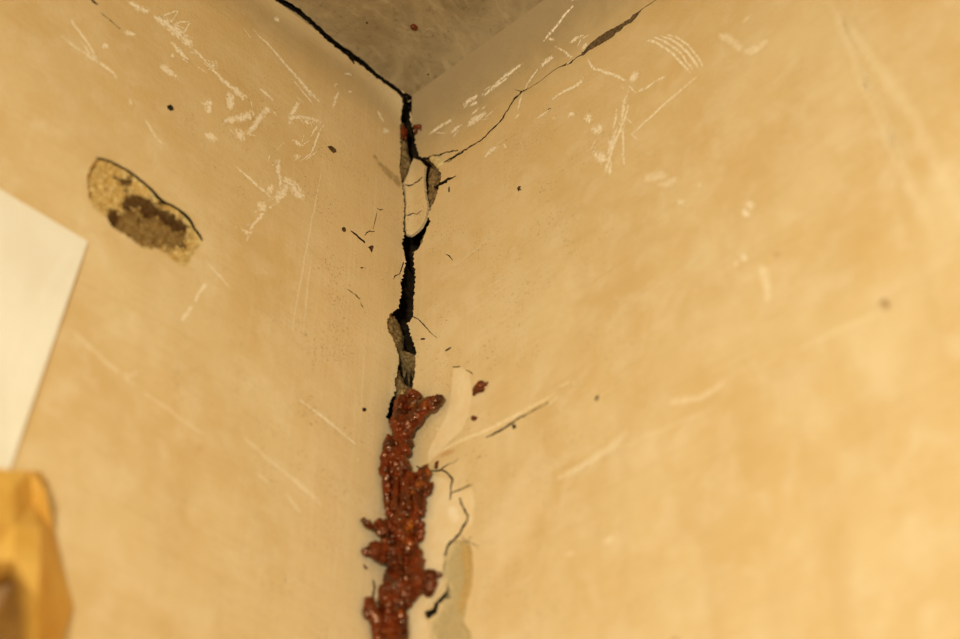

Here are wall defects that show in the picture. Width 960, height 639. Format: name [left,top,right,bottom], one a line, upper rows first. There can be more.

flaking render [87,157,203,266]
crack [275,0,581,420]
crack [416,458,478,619]
flaking render [432,540,474,639]